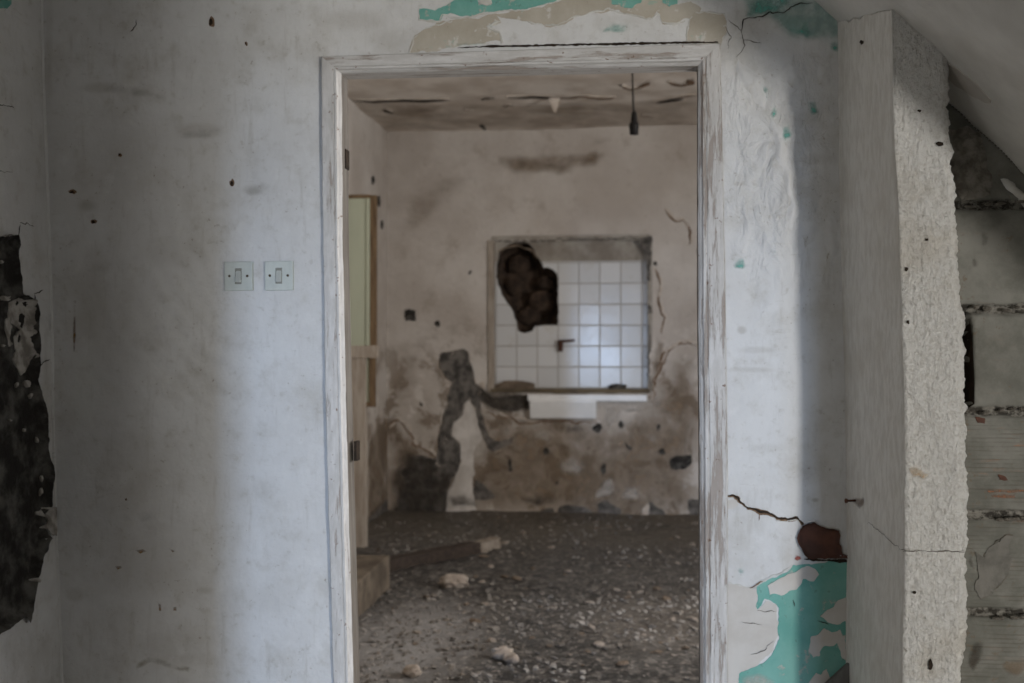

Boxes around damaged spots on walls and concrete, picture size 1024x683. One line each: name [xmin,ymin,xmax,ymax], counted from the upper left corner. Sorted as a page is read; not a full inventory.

peeling [409,0,727,53]
crack [459,2,809,57]
spalling [936,126,993,202]
spalling [496,243,559,333]
spalling [0,234,58,634]
water stain [369,423,449,515]
spalling [388,349,602,511]
water stain [479,390,527,411]
water stain [488,375,686,506]
crack [728,494,804,525]
peeling [728,521,848,683]